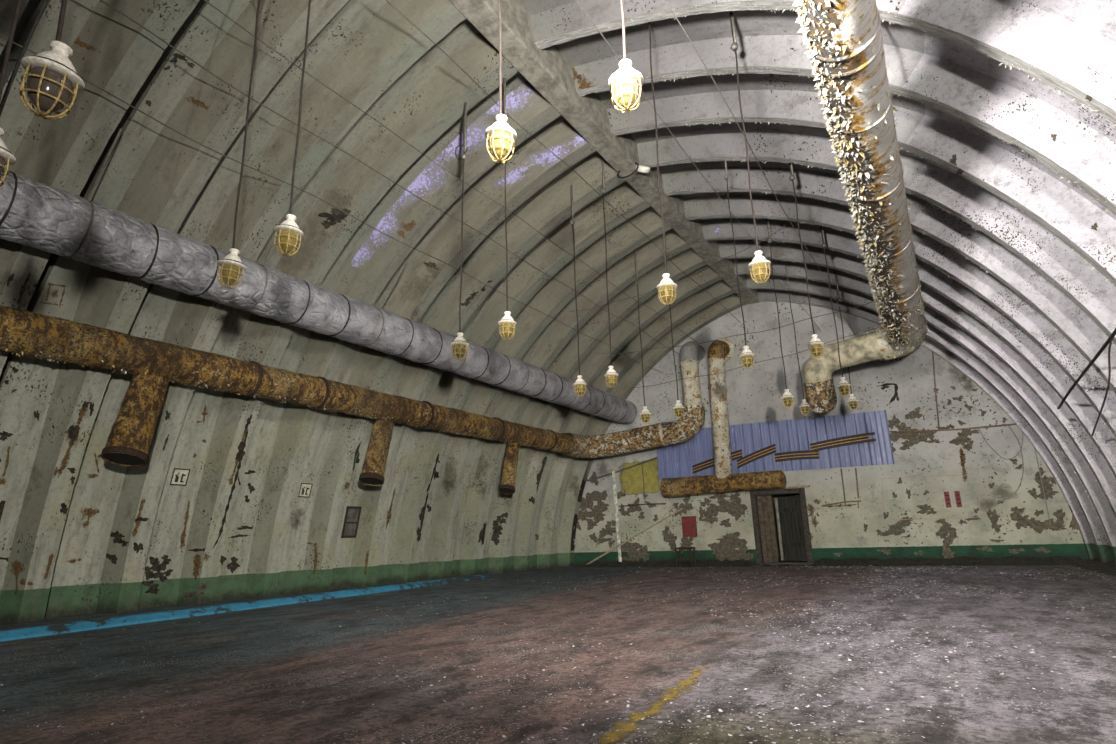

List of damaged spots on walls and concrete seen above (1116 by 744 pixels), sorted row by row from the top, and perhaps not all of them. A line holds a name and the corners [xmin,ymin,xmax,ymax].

corrosion [54,400,89,475]
corrosion [229,414,252,484]
peeling [166,373,664,504]
peeling [570,472,754,561]
peeling [864,410,1116,559]
peeling [106,531,173,594]